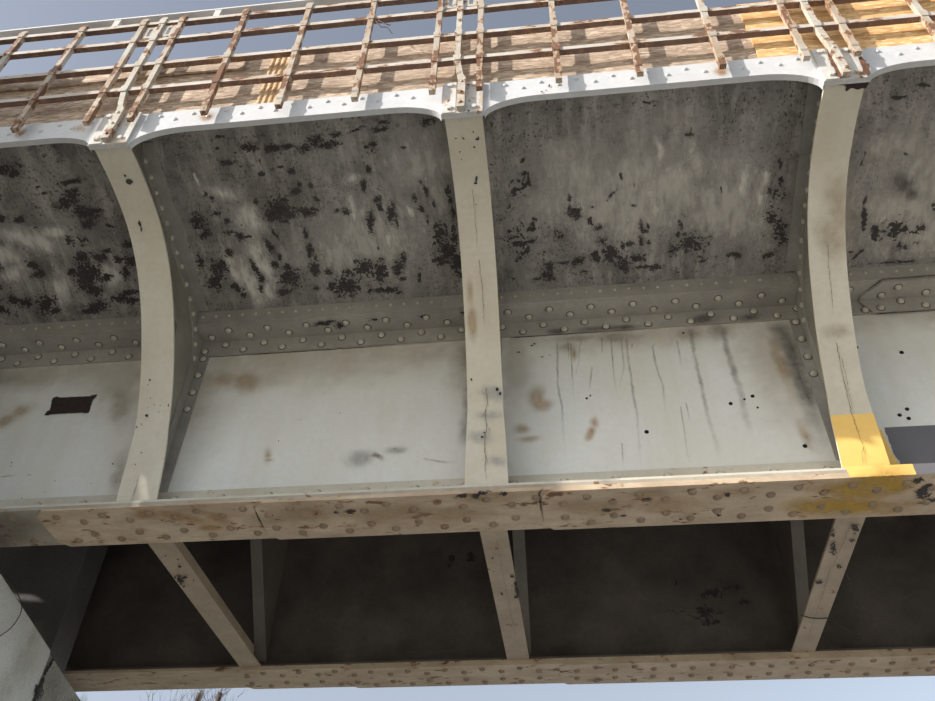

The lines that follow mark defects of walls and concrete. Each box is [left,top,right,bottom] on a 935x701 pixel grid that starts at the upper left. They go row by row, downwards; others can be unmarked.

corrosion [827,49,842,77]
corrosion [859,57,870,75]
leakage [0,227,67,282]
leakage [101,264,124,287]
leakage [193,173,281,307]
leakage [318,194,426,279]
leakage [535,138,777,242]
leakage [848,132,935,260]
peeling [45,394,97,415]
crack [481,389,490,477]
crack [836,343,867,463]
peeling [913,477,935,502]